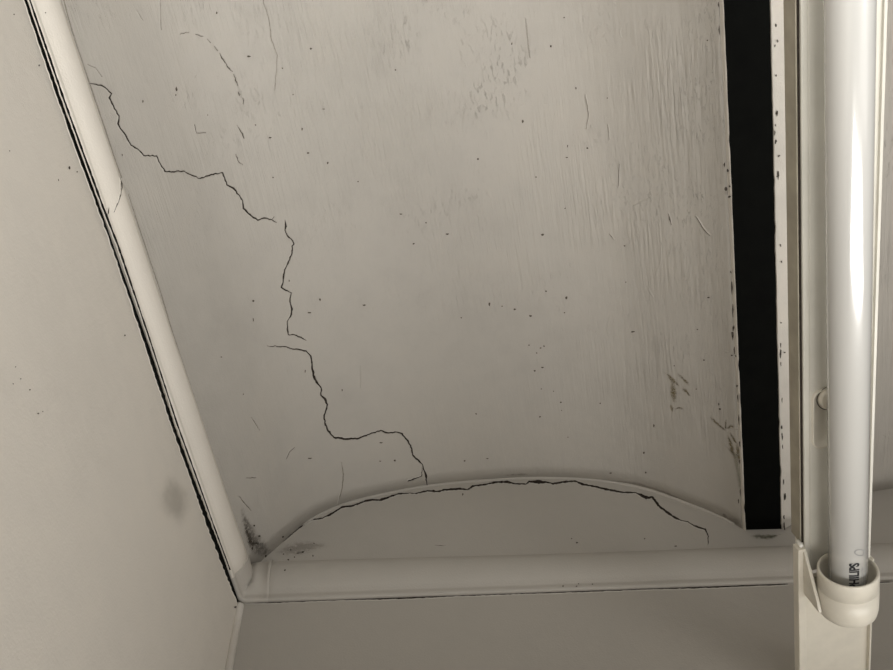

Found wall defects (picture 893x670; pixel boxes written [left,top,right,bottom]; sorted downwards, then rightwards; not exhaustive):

crack [62,0,709,545]